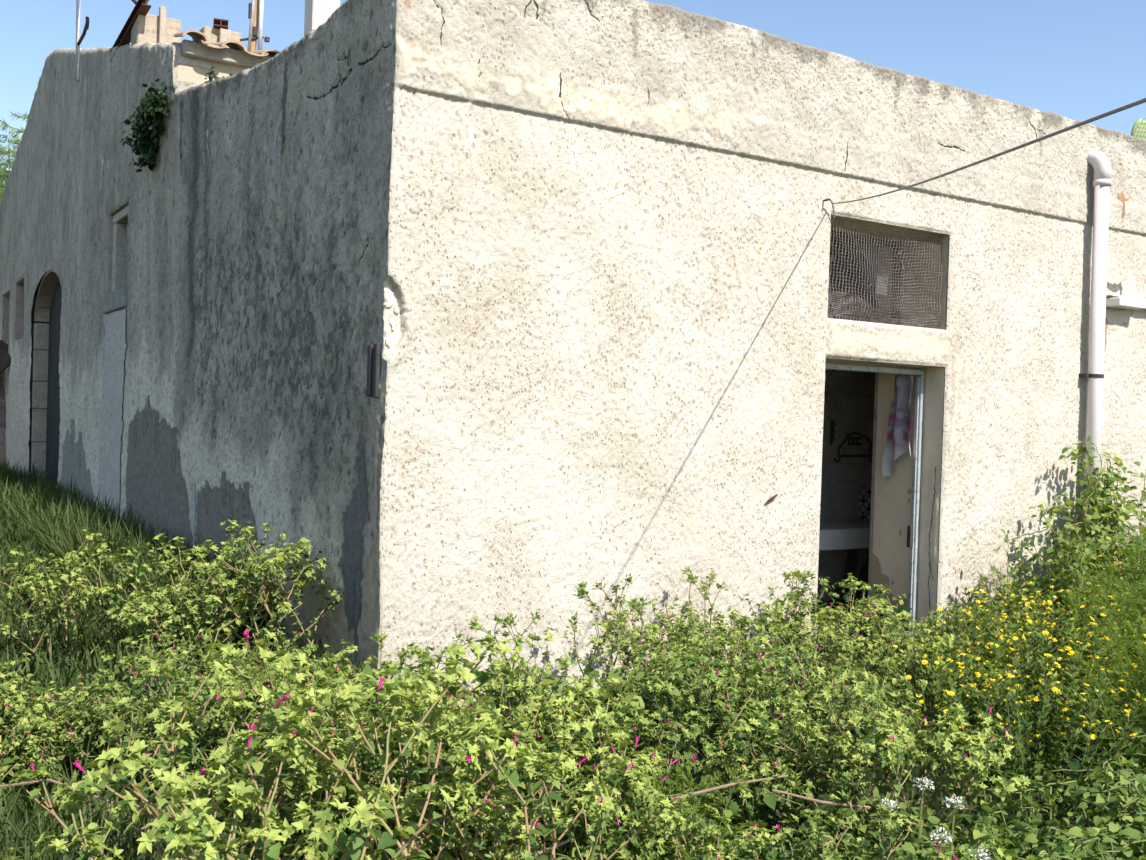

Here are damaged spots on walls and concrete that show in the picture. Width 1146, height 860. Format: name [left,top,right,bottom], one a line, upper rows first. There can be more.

crack [433,0,445,45]
crack [307,43,391,100]
damp [125,30,380,688]
damp [61,419,95,506]